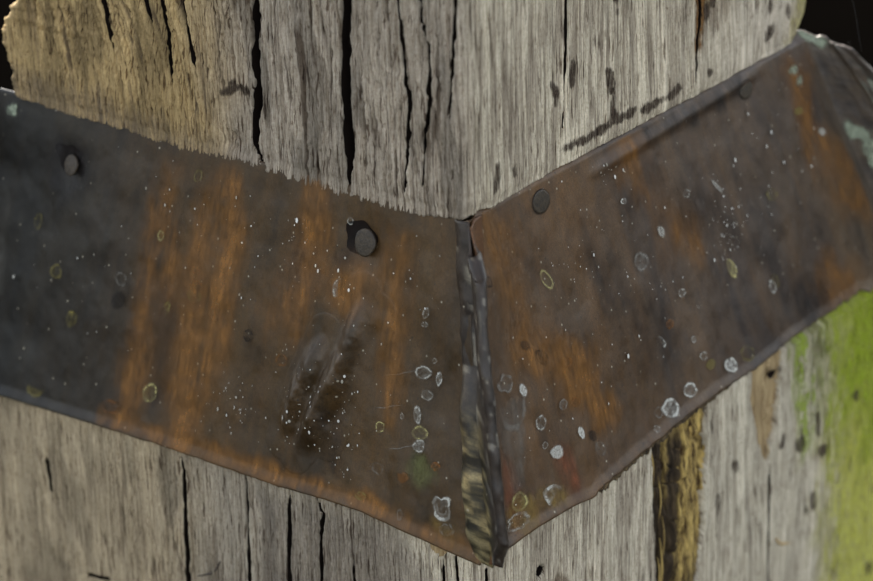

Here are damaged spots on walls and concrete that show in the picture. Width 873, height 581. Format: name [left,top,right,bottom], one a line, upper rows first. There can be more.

crack [144,0,196,80]
crack [251,0,264,162]
crack [341,0,355,185]
crack [694,0,702,86]
water stain [816,413,827,458]
crack [182,460,192,581]
crack [286,495,294,581]
crack [317,498,325,581]